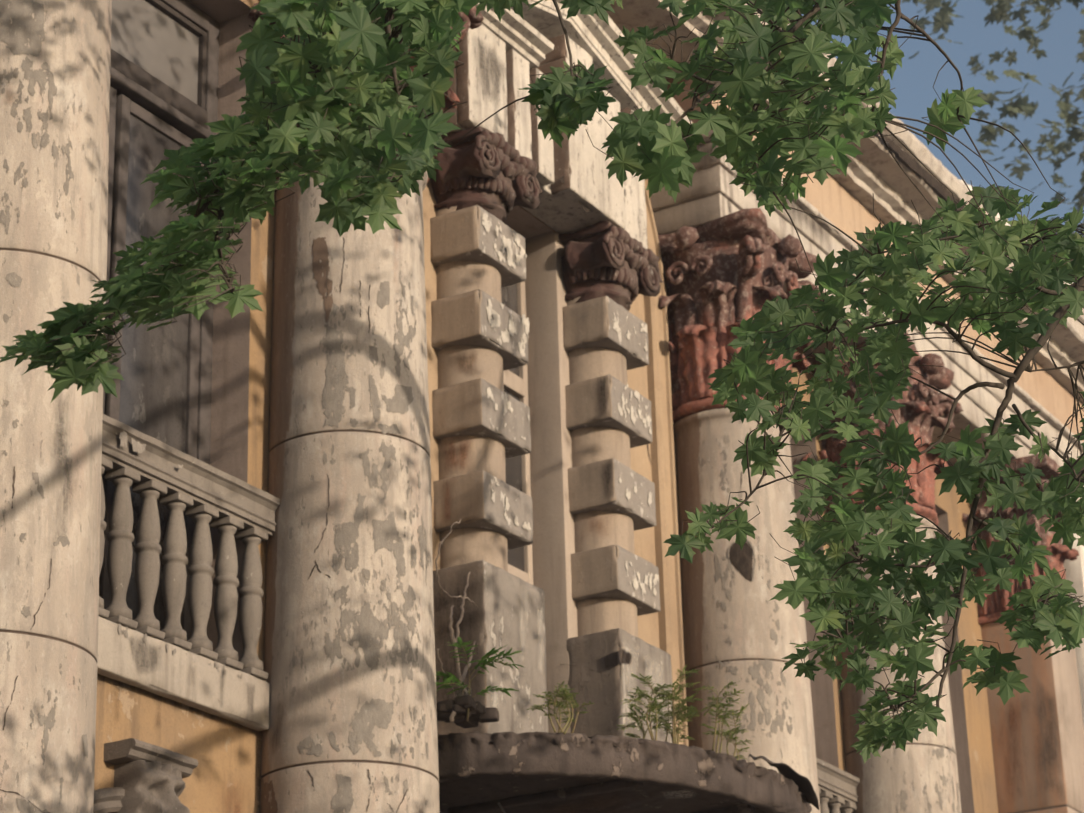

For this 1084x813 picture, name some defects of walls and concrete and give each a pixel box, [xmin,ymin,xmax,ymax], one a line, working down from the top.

peeling [0,0,74,235]
peeling [482,214,527,269]
peeling [613,313,648,351]
peeling [312,237,429,684]
crack [308,478,331,579]
peeling [30,664,81,765]
flaking render [16,798,49,813]